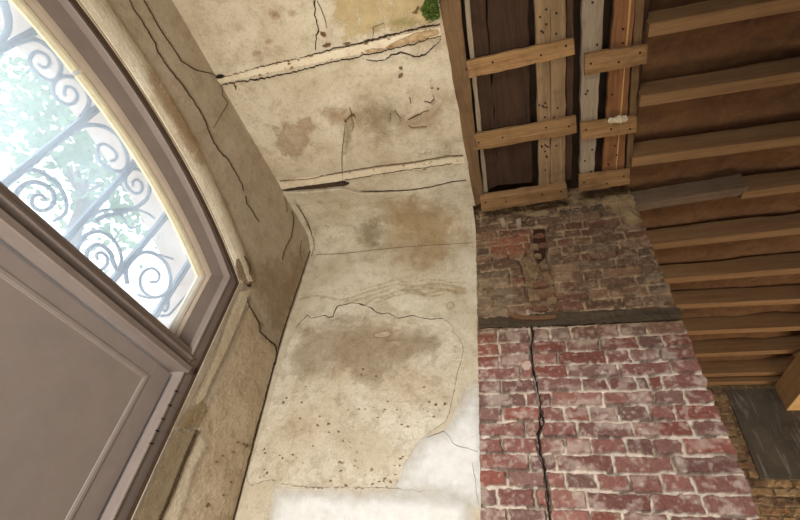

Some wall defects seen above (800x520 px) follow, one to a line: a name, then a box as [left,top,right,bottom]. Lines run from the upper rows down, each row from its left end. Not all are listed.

crack [129,0,259,222]
crack [313,0,327,50]
peeling [334,0,445,78]
spalling [162,290,469,520]
crack [530,324,551,520]